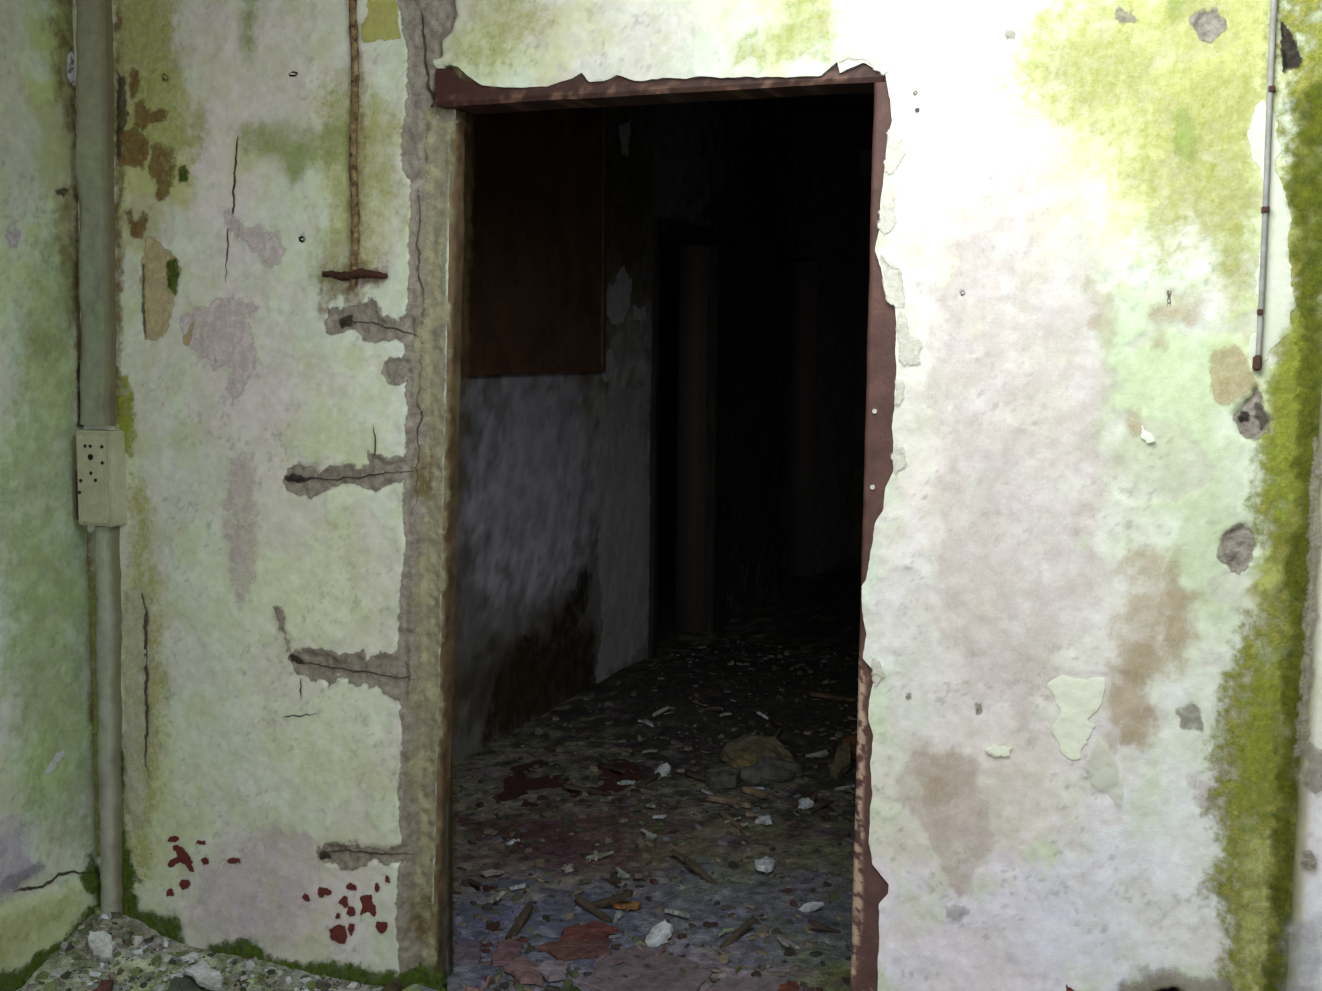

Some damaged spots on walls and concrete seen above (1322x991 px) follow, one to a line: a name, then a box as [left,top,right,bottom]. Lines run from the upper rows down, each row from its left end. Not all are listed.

damp [74,261,84,427]
peeling [120,70,176,201]
spalling [273,0,473,978]
peeling [1210,100,1297,439]
damp [87,533,100,856]
spalling [1119,968,1232,991]